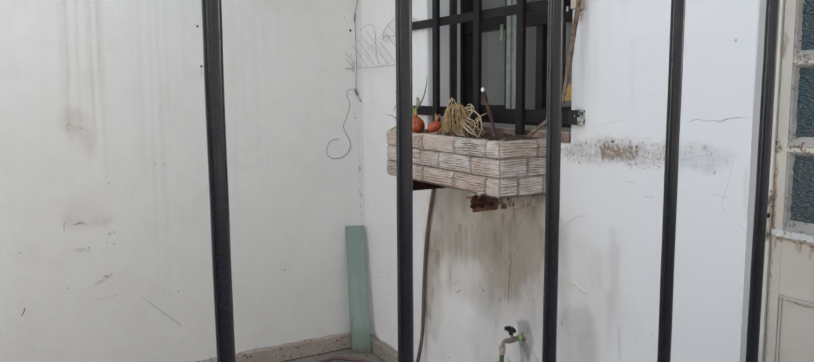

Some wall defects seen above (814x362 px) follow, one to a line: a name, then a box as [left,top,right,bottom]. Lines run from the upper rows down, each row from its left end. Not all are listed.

water stain [595,138,649,164]
rust [470,195,494,209]